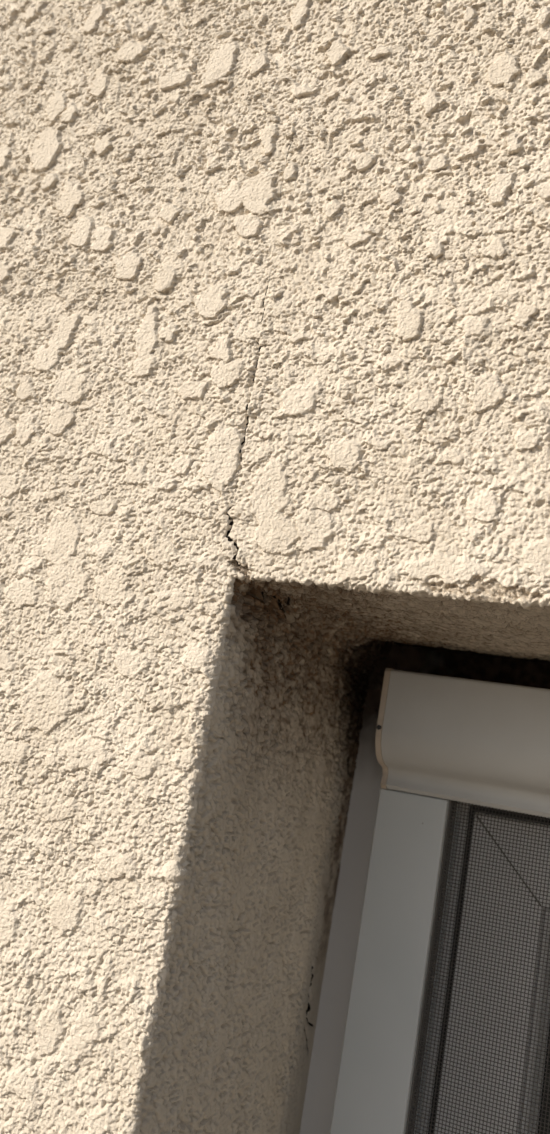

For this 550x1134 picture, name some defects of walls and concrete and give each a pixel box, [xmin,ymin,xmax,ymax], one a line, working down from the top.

crack [226,277,270,571]